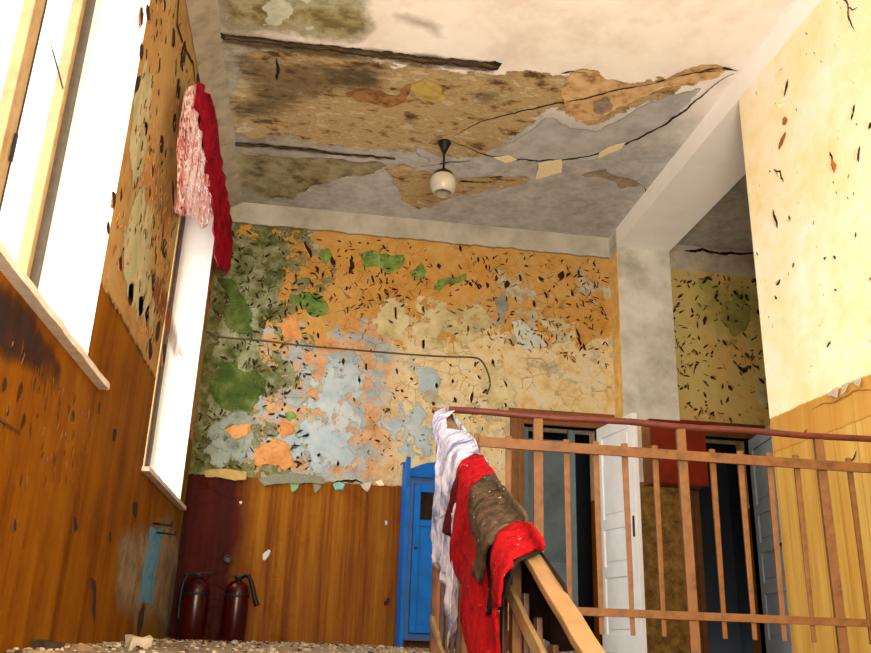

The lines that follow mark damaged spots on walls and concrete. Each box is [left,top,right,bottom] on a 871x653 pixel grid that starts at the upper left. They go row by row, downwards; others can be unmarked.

crack [843,0,857,29]
crack [235,142,395,160]
peeling [228,51,724,209]
crack [416,67,736,183]
peeling [766,68,788,152]
crack [685,247,754,255]
water stain [0,286,60,376]
peeling [0,361,100,492]
peeling [189,230,609,493]
peeling [673,263,794,423]
peeling [827,378,861,398]